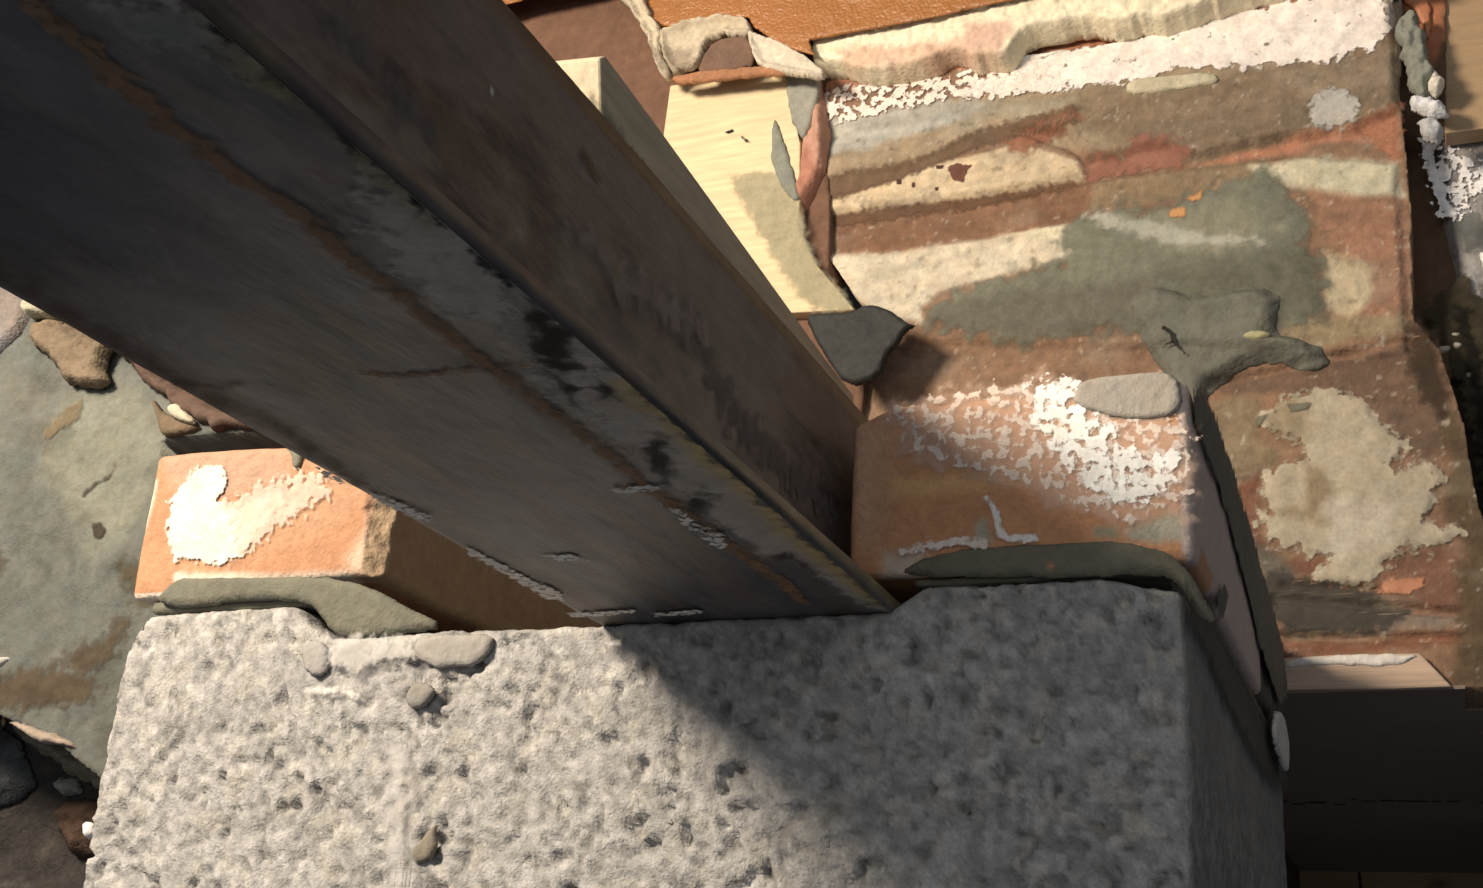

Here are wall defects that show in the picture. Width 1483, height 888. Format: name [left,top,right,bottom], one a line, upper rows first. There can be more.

leakage [1409,324,1448,415]
efflorescence [886,372,1199,556]
efflorescence [164,465,331,566]